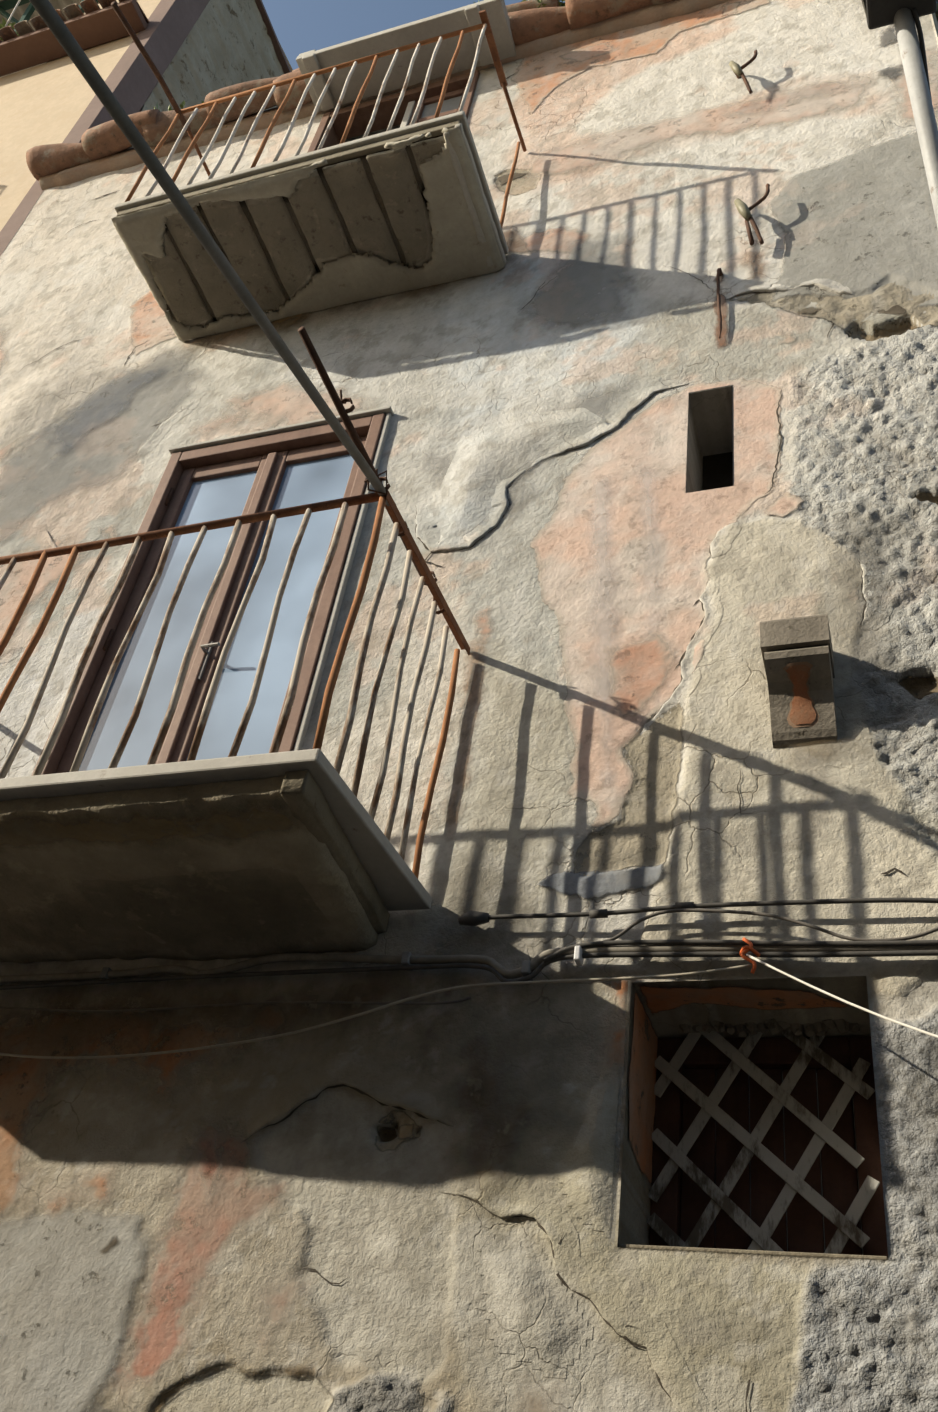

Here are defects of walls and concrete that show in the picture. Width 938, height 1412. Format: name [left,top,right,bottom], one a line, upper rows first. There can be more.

peeling [130,291,176,355]
water stain [534,242,628,326]
rust [713,268,728,347]
water stain [0,312,307,531]
crack [415,372,689,567]
peeling [530,378,803,876]
spalling [899,676,938,700]
peeling [0,1005,285,1214]
flaking render [375,1110,422,1152]
crack [441,1173,751,1412]
flaking render [149,1364,333,1412]